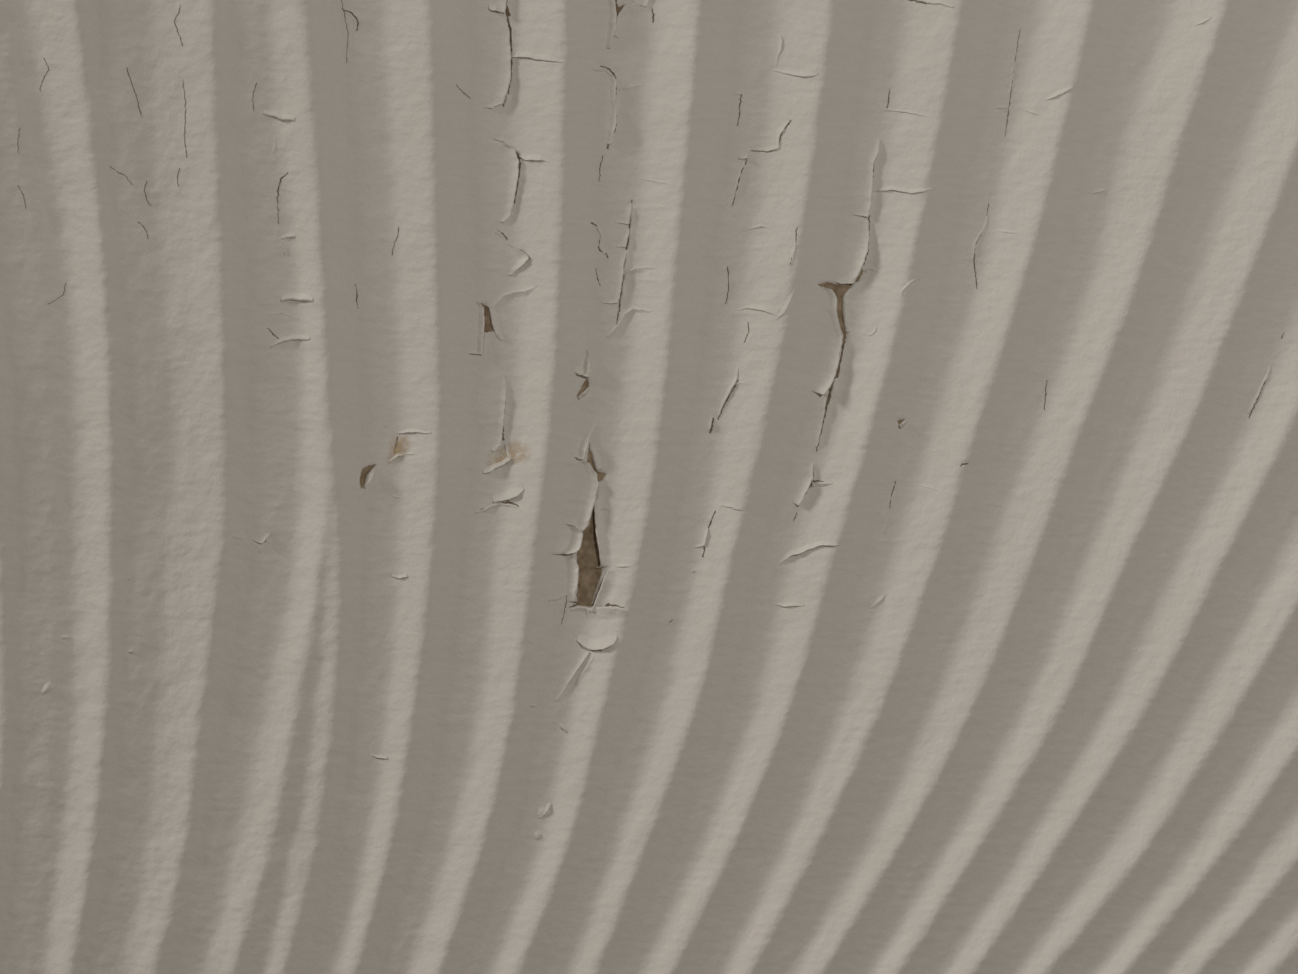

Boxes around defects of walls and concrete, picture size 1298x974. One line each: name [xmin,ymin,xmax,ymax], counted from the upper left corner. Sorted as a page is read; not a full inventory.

peeling [482,374,516,474]
peeling [360,464,376,489]
peeling [475,486,524,514]
peeling [549,424,631,624]